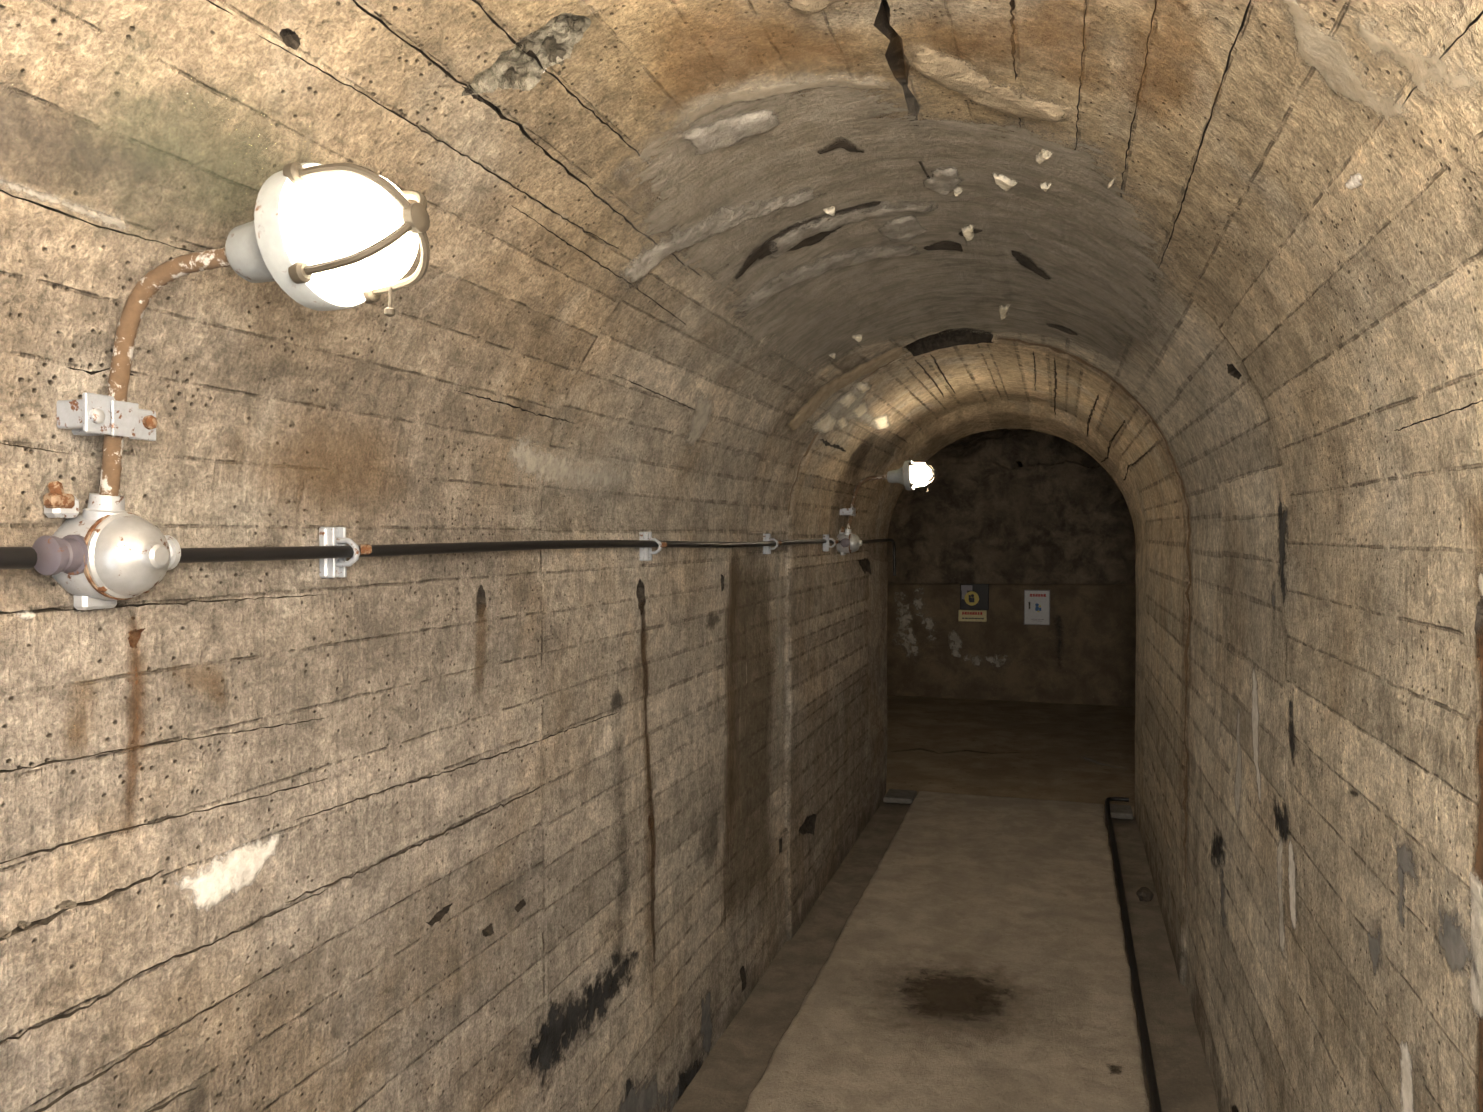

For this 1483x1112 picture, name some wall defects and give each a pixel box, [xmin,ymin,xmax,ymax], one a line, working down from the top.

crack [874,0,926,120]
corrosion [1473,627,1483,892]
water stain [901,972,1012,1021]